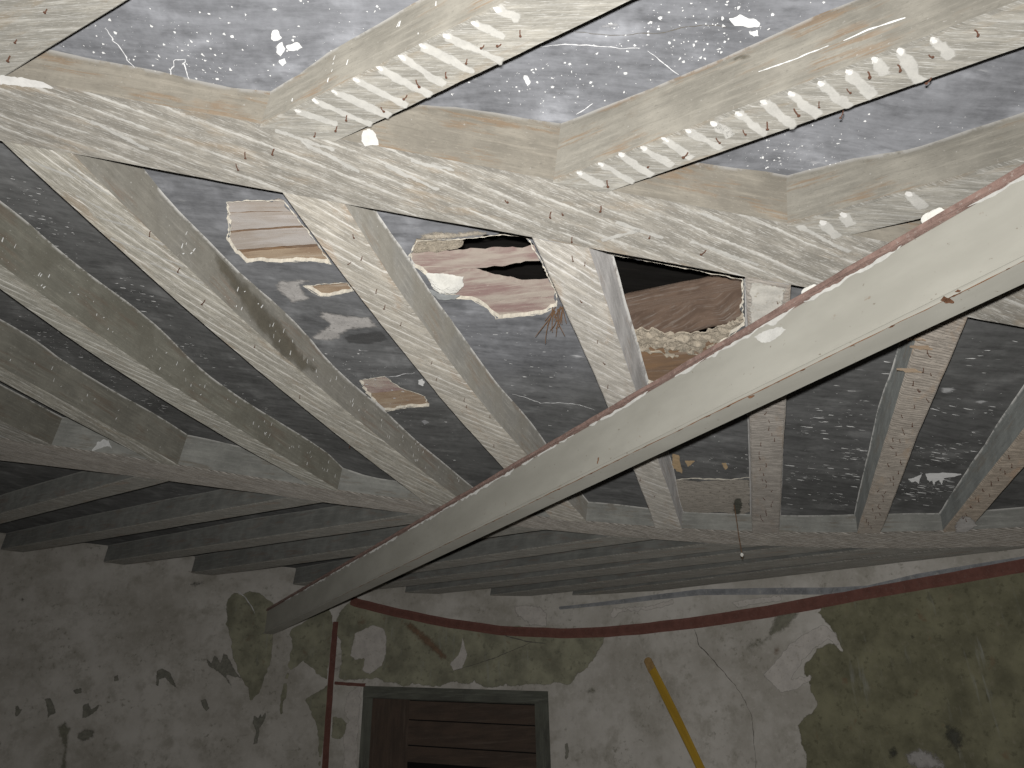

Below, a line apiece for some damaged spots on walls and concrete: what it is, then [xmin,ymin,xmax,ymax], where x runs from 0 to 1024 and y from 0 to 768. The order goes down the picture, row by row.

peeling [644,1,774,63]
spalling [226,198,331,265]
peeling [277,280,354,302]
spalling [408,231,558,319]
spalling [589,246,901,426]
spalling [360,375,429,411]
peeling [287,435,573,600]
peeling [899,431,979,506]
peeling [207,591,274,700]
peeling [280,603,604,768]
crack [695,632,756,767]
peeling [798,572,1024,768]